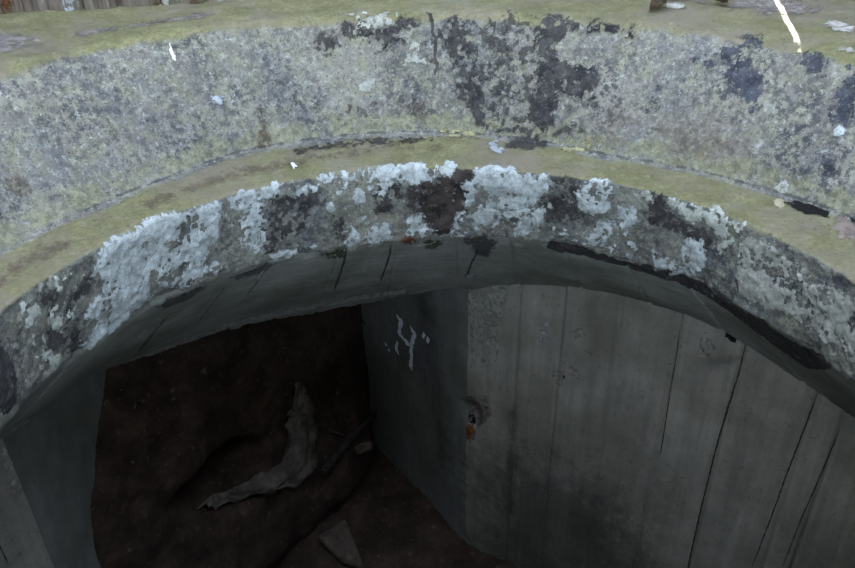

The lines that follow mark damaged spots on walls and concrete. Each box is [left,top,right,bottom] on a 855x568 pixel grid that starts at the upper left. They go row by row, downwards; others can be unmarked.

damp [313,14,421,58]
damp [439,10,636,151]
damp [688,32,777,114]
damp [321,215,347,259]
crack [334,249,347,290]
crack [380,246,391,281]
damp [370,164,499,258]
damp [0,340,18,415]